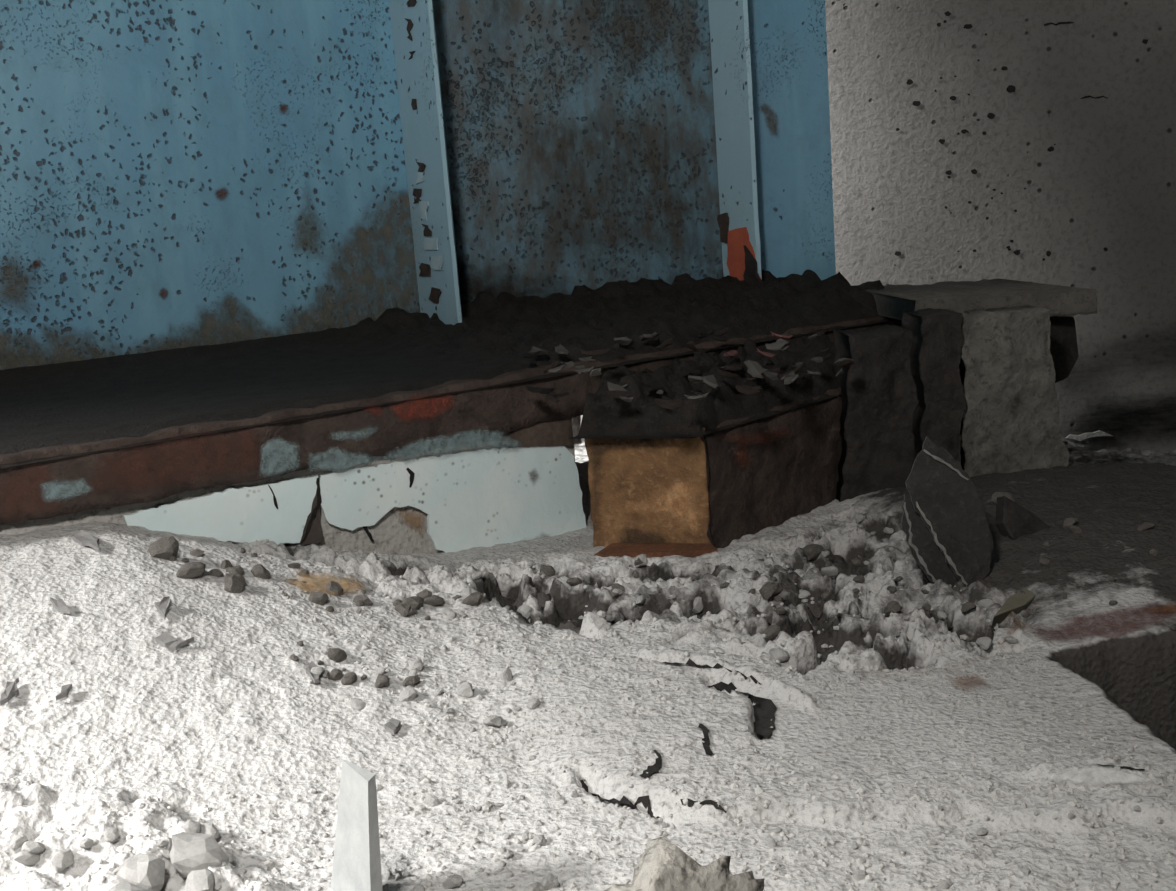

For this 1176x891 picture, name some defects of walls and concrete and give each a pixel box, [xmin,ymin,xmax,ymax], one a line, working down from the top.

corrosion [138,193,420,353]
corrosion [457,263,548,304]
corrosion [0,332,113,370]
corrosion [499,416,664,471]
crack [268,484,278,509]
crack [301,475,324,545]
corrosion [626,482,698,530]